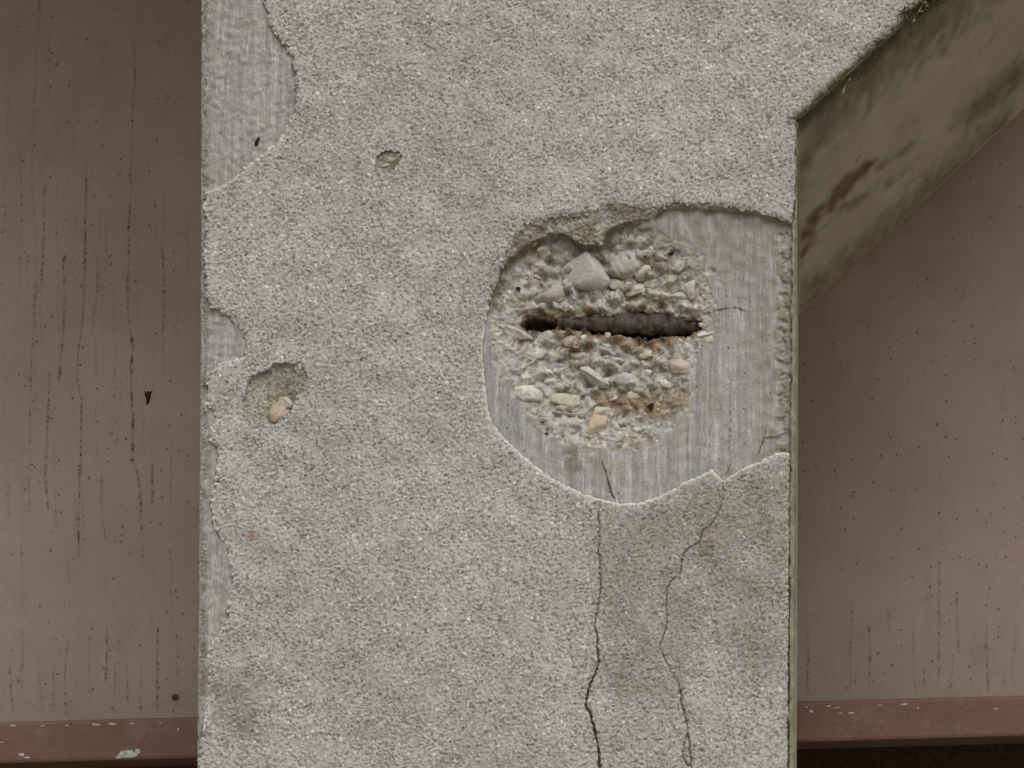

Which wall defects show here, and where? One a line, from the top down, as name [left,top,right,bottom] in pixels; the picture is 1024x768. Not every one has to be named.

peeling [201,0,297,200]
spalling [375,150,402,173]
spalling [242,361,308,428]
spalling [483,199,793,504]
peeling [197,301,247,762]
crack [585,527,601,768]
crack [641,685,692,767]
crack [660,400,731,662]